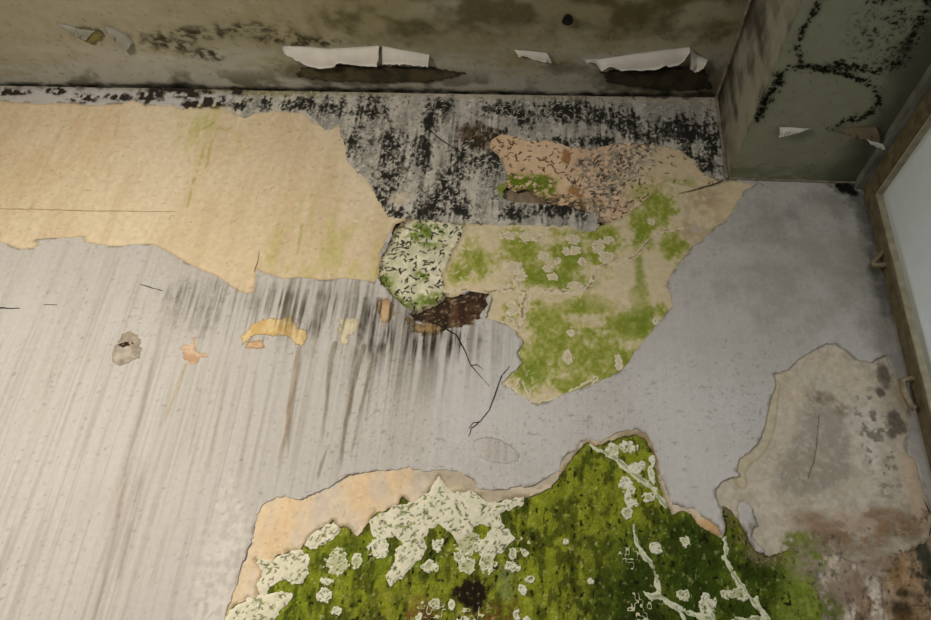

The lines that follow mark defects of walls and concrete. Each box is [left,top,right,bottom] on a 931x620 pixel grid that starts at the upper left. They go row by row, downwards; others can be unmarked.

peeling [282,46,466,84]
peeling [582,47,712,91]
damp [753,0,931,131]
flaking render [0,100,406,293]
damp [0,65,736,232]
flaking render [489,134,724,224]
damp [362,301,393,351]
damp [405,318,461,355]
spalling [405,292,489,336]
crack [433,322,509,436]
flaking render [715,344,931,564]
damp [797,508,931,620]